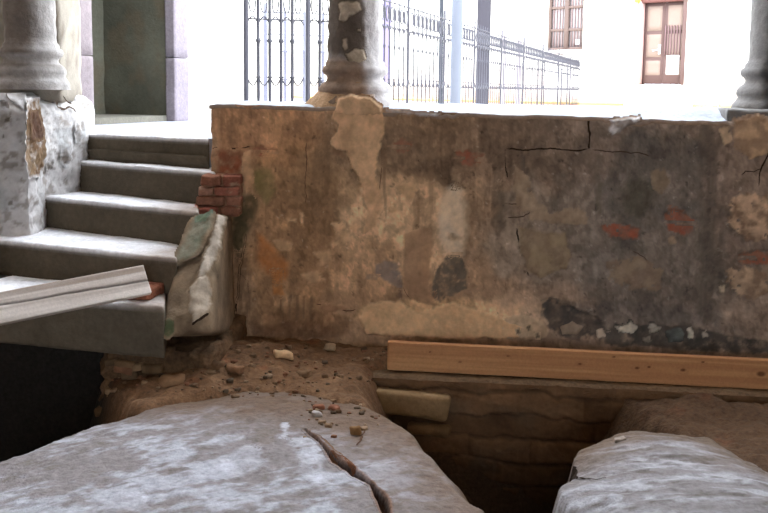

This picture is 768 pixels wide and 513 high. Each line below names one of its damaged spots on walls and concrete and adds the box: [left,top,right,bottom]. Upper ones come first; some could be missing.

flaking render [338,0,363,23]
flaking render [341,37,367,63]
flaking render [299,93,442,286]
crack [505,121,649,178]
flaking render [716,113,768,160]
crack [743,153,768,183]
peeling [174,145,255,327]
flaking render [726,190,768,244]
crack [301,429,395,513]